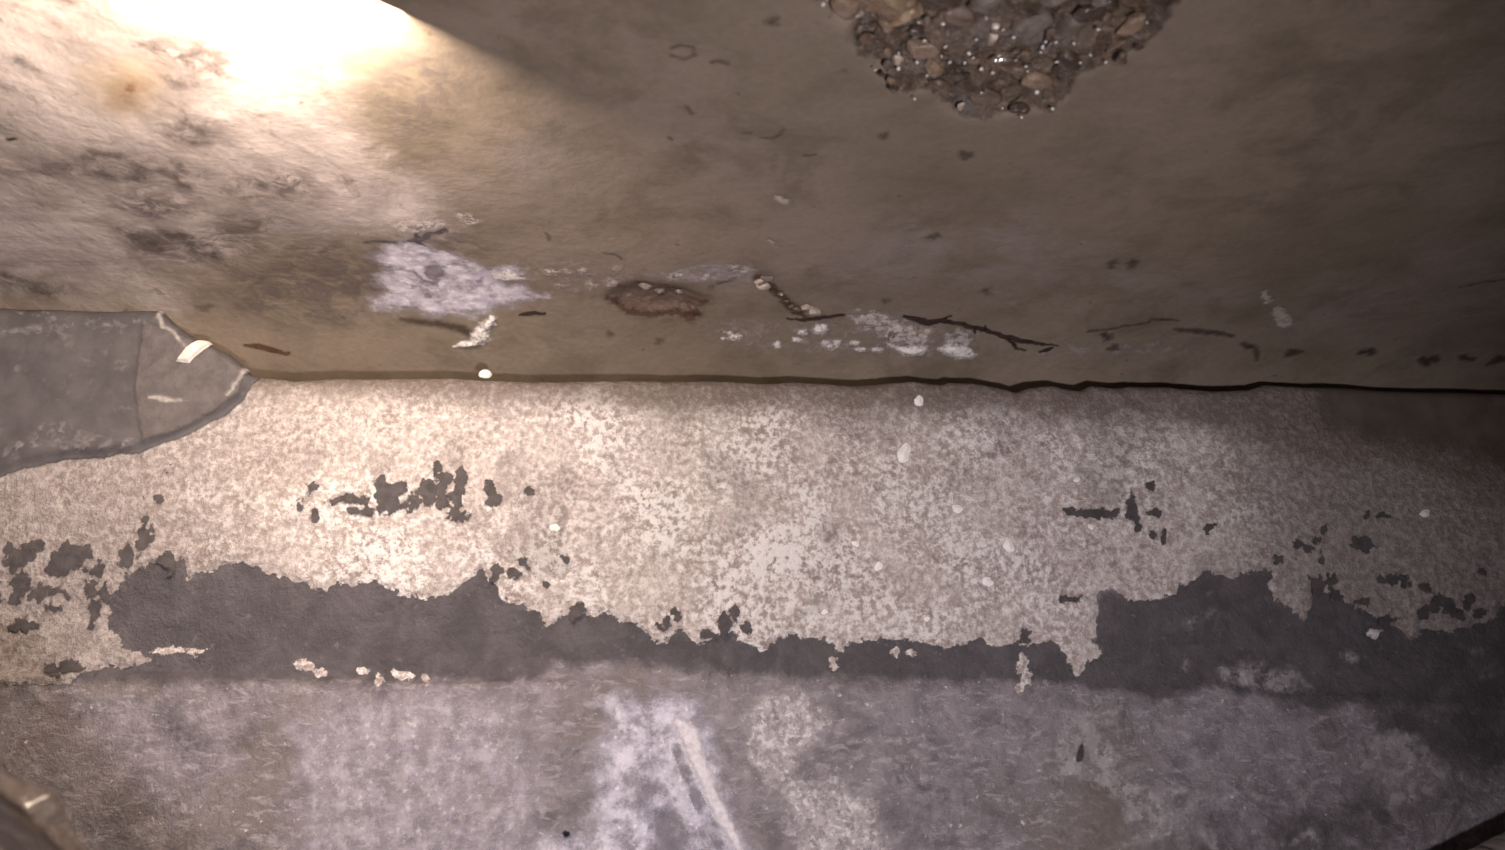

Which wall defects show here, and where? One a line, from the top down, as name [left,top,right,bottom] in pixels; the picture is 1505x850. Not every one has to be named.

damp [179,50,227,74]
spalling [830,0,1179,120]
damp [83,151,189,187]
damp [372,213,630,348]
damp [660,264,754,282]
damp [721,309,980,359]
flaking render [0,309,1505,693]
damp [280,691,529,850]
damp [538,696,745,850]